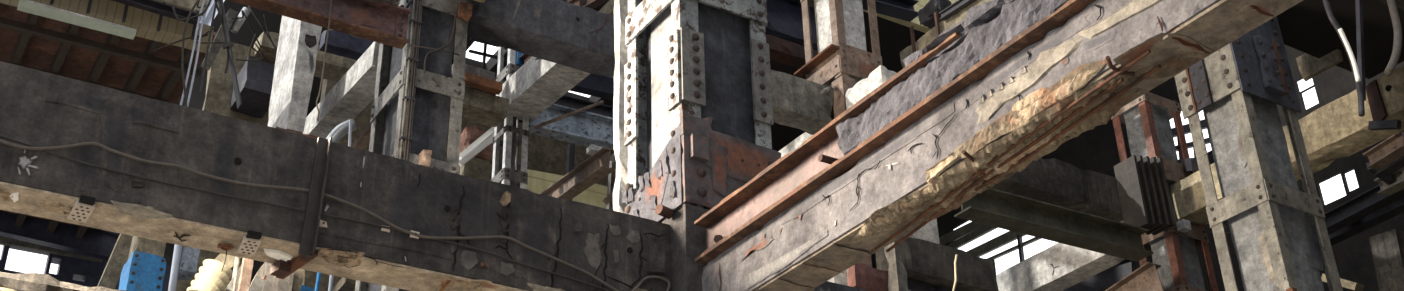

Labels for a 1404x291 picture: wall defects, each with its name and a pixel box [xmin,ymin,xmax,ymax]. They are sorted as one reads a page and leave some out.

corrosion [704,128,781,196]
crack [822,99,968,211]
crack [778,243,872,288]